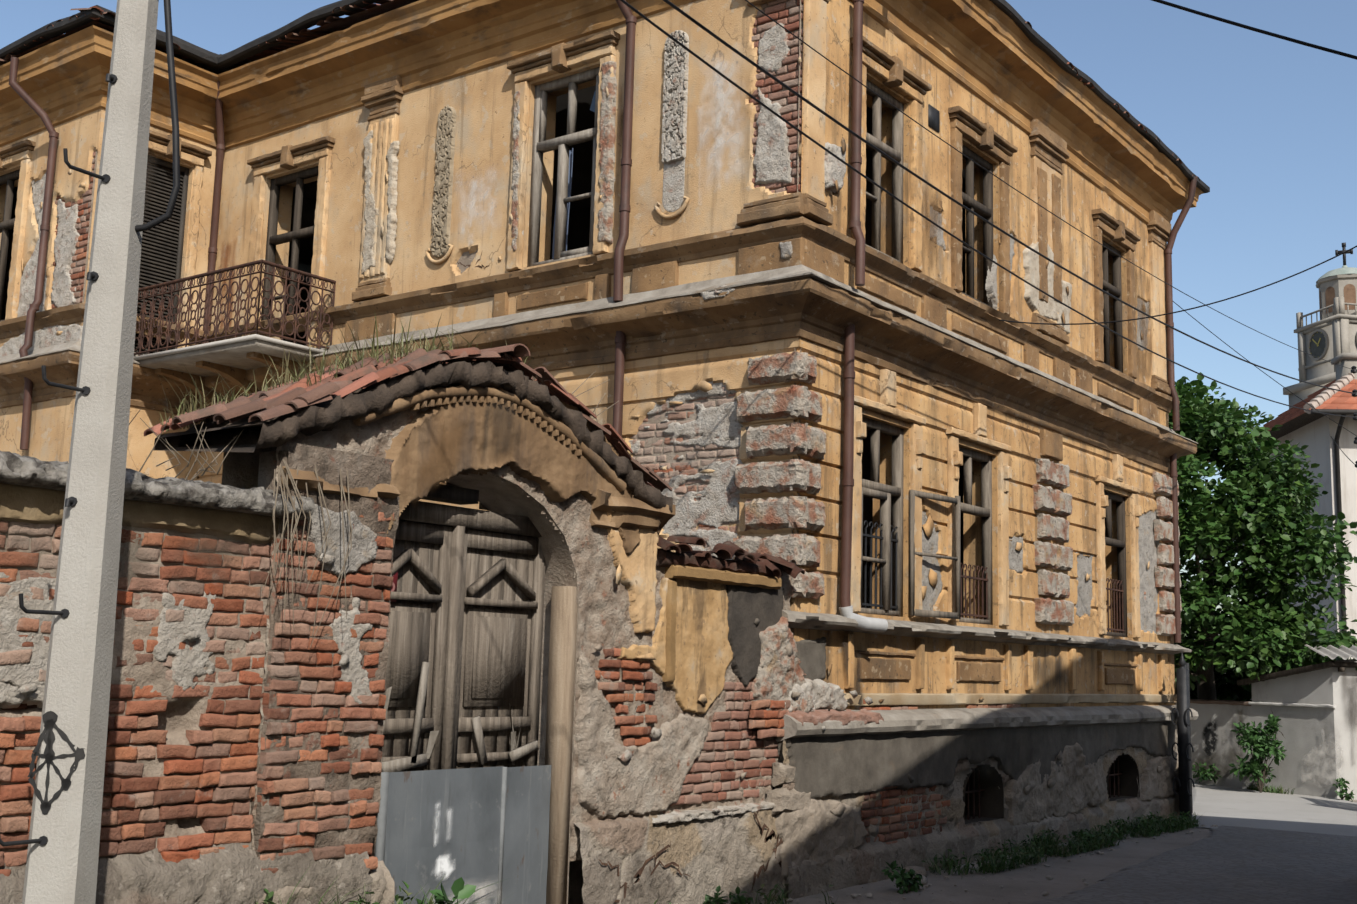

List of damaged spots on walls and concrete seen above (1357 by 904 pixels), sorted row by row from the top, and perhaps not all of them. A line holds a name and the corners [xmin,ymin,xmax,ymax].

flaking render [0,149,98,357]
flaking render [749,0,804,193]
peeling [824,137,846,194]
peeling [1,685,38,710]
peeling [306,504,378,580]
peeling [574,381,950,877]